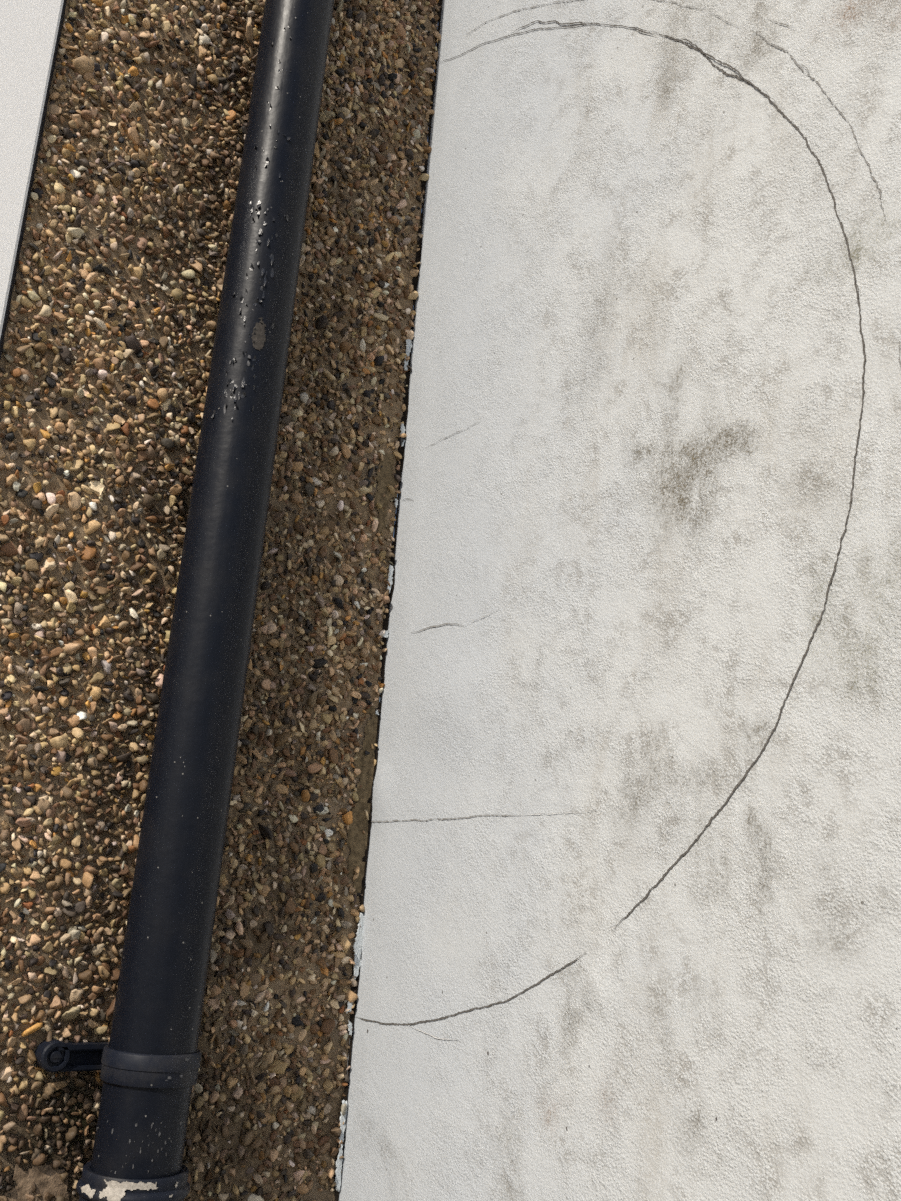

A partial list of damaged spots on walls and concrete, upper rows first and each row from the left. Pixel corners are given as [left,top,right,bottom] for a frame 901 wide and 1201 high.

crack [360,0,885,931]
crack [334,949,587,1201]